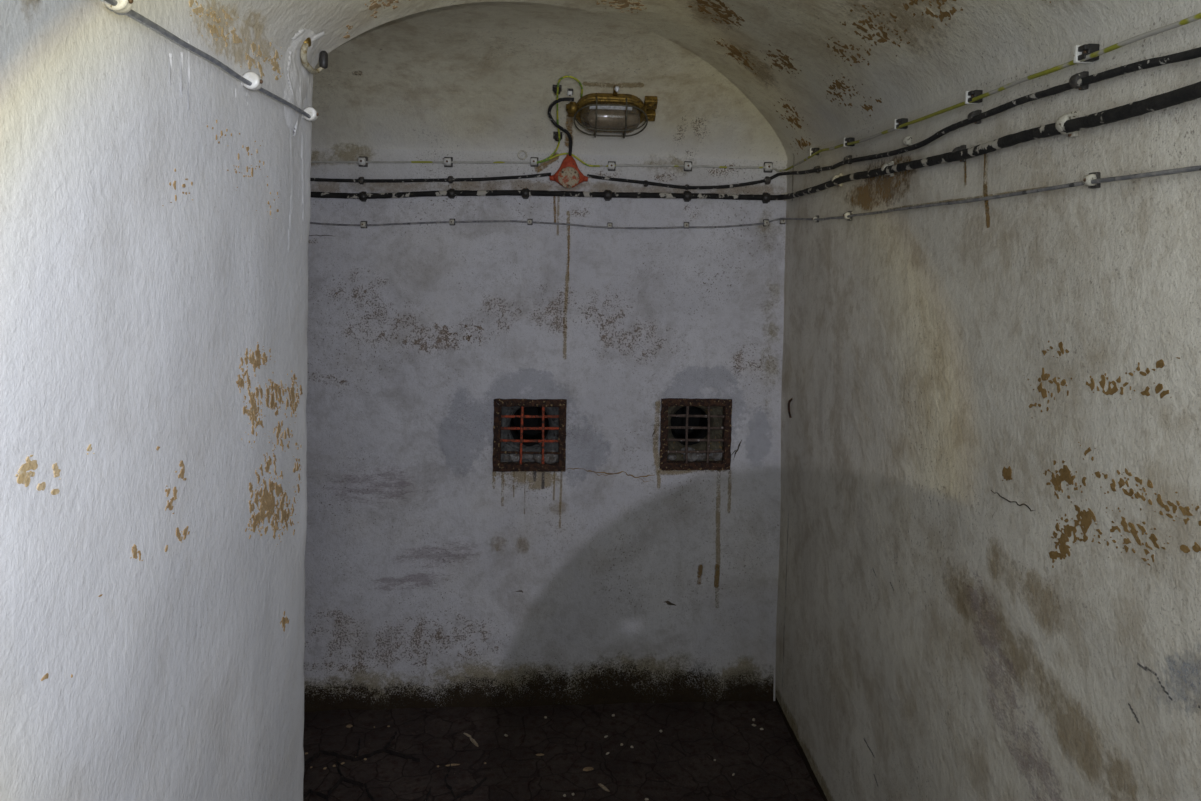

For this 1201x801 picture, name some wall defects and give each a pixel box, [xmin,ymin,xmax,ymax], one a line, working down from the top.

peeling [189,0,283,80]
peeling [826,0,963,116]
corrosion [329,196,678,363]
peeling [1024,341,1180,412]
peeling [15,455,61,495]
peeling [236,342,303,547]
corrosion [492,471,562,527]
crack [568,468,655,482]
corrosion [697,470,731,608]
peeling [1002,466,1013,481]
peeling [1043,442,1201,568]
water stain [304,662,827,801]